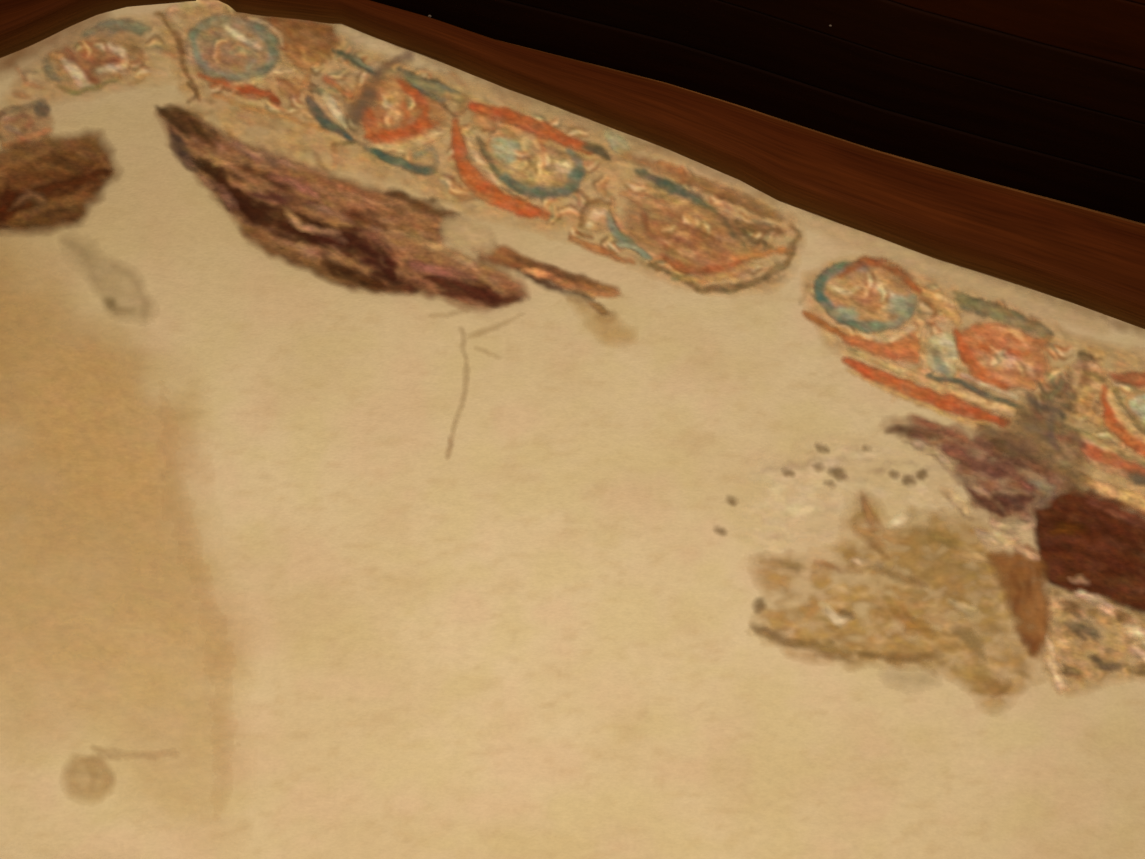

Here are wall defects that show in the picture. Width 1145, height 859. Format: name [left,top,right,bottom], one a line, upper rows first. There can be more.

spalling [0,135,112,230]
spalling [158,107,616,314]
spalling [892,417,1145,689]